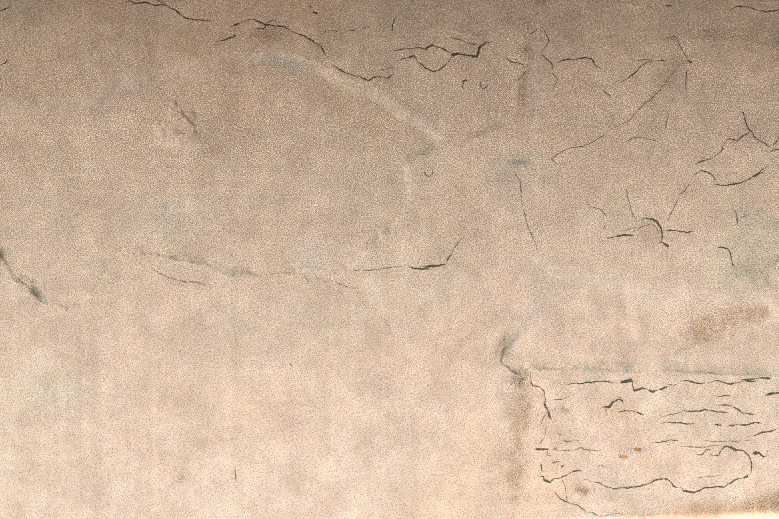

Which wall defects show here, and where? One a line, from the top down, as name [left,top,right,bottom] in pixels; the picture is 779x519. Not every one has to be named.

spalling [154,100,200,151]
crack [529,13,600,87]
crack [551,36,692,164]
crack [586,112,779,247]
crack [336,239,461,289]
spalling [500,256,779,504]